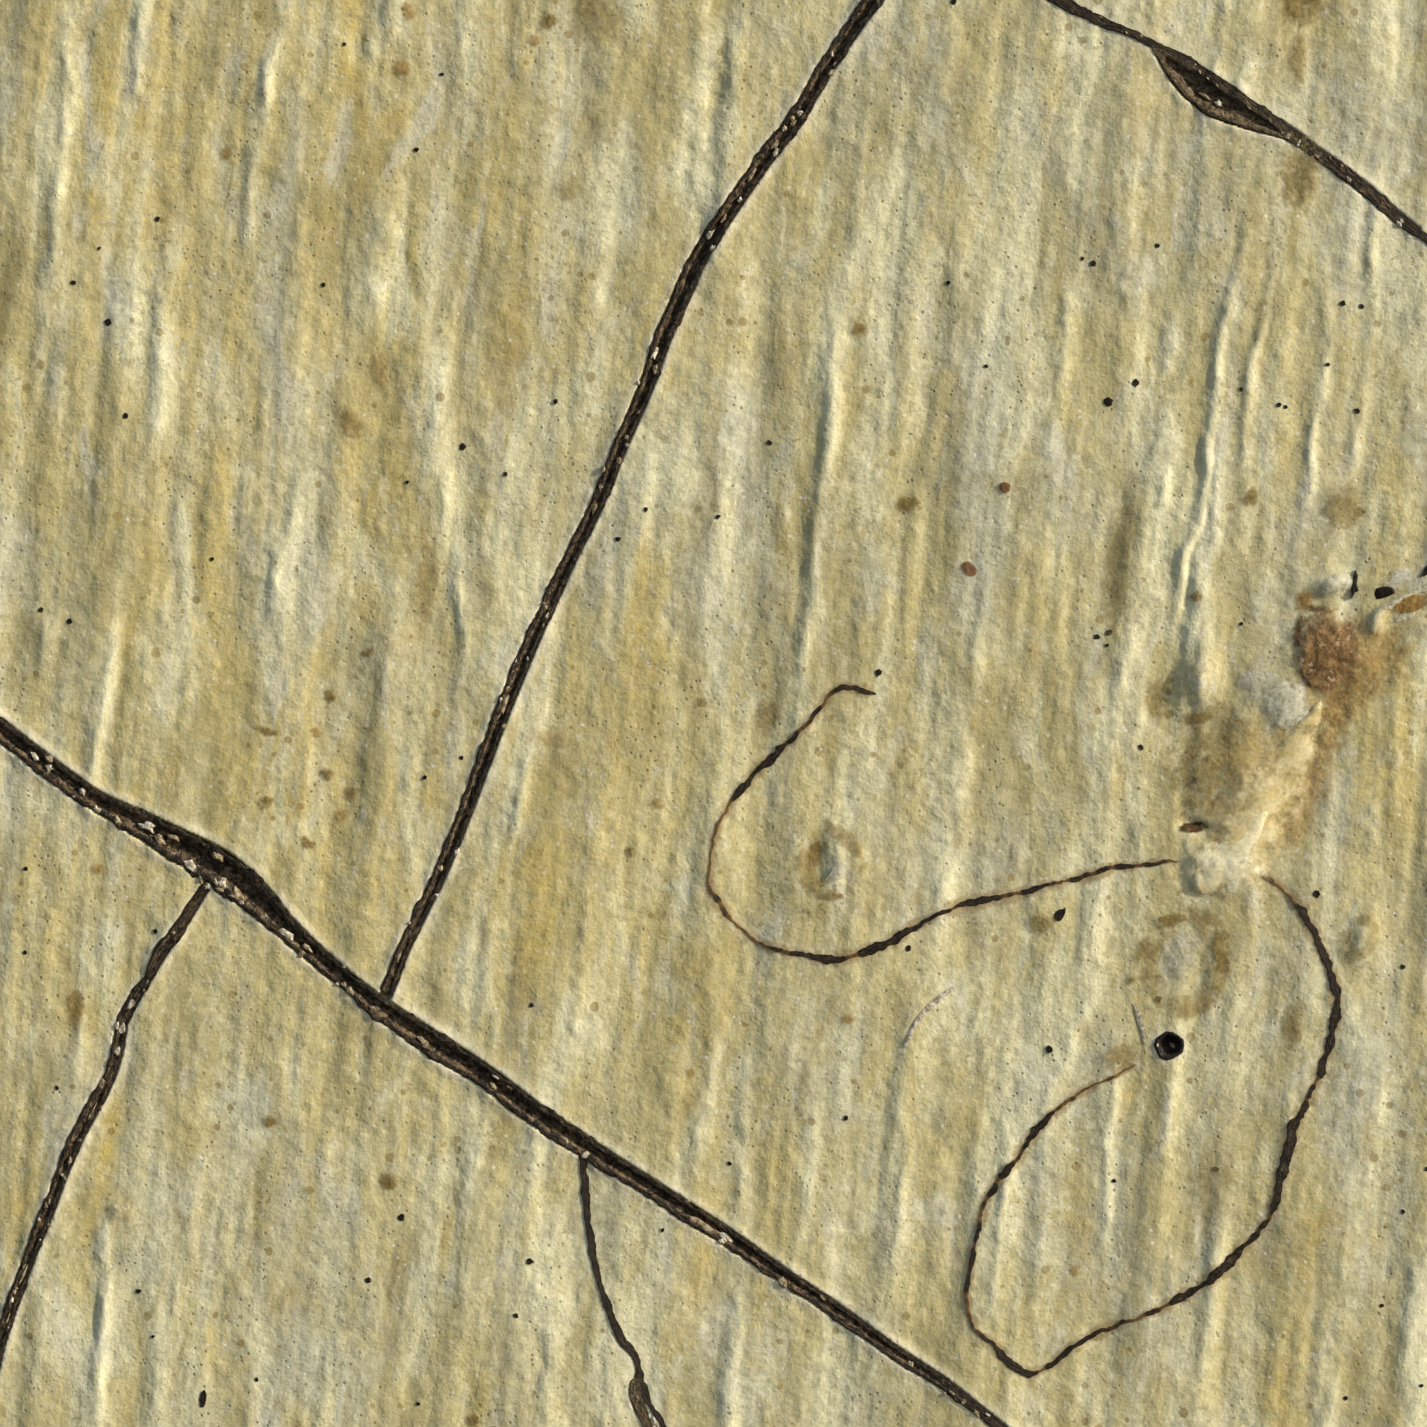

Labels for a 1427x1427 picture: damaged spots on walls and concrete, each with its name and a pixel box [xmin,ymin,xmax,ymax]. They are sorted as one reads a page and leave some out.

crack [1048,0,1427,245]
crack [0,0,1007,1427]
crack [708,684,1179,965]
damp [1187,712,1212,724]
crack [964,871,1342,1378]